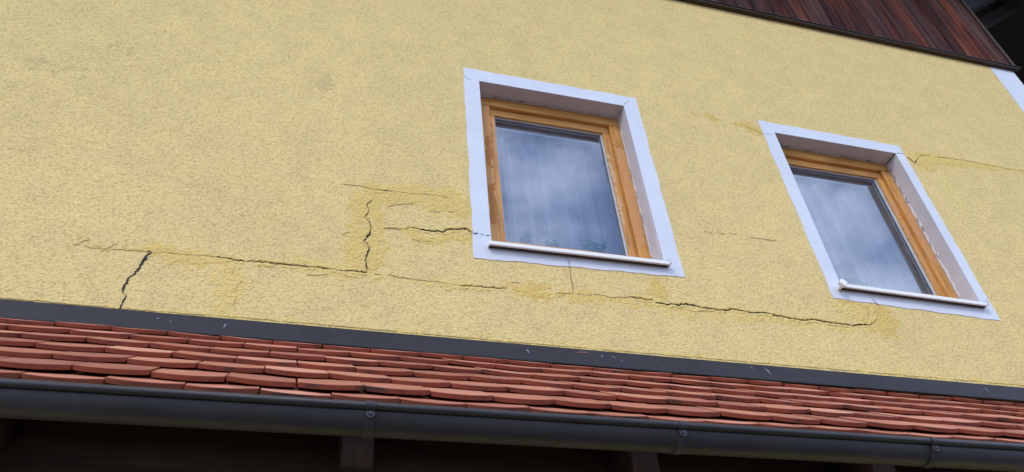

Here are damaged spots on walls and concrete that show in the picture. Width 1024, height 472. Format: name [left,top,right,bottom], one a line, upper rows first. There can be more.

crack [0,184,1024,386]